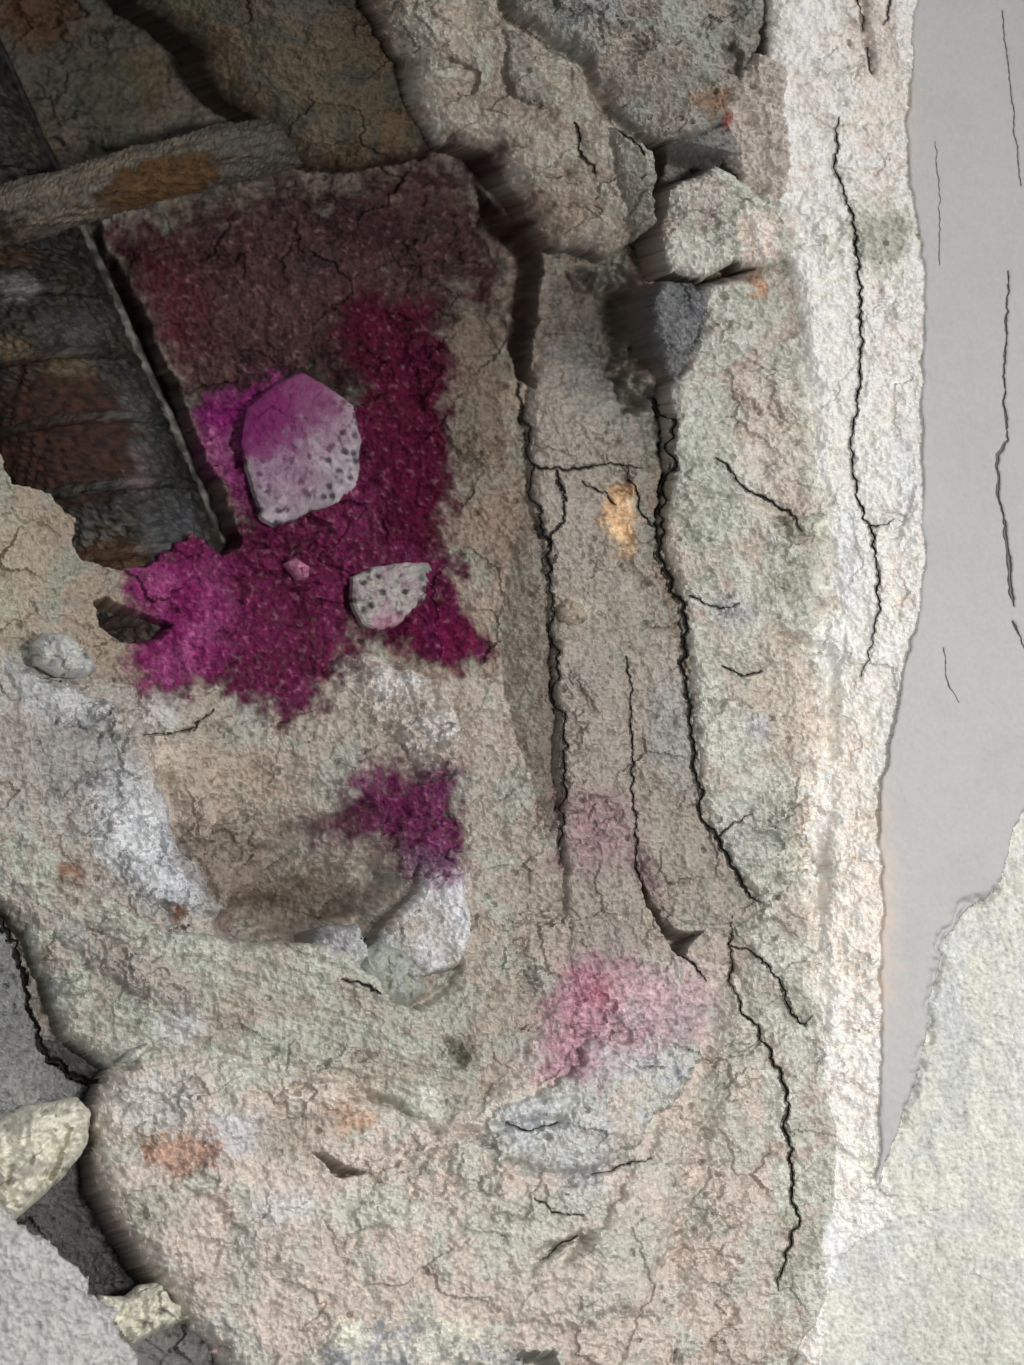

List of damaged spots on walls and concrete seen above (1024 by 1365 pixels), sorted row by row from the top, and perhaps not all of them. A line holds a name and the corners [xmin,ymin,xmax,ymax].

rust [0,372,145,507]
spalling [0,0,227,185]
rust [92,152,232,210]
spalling [0,150,517,570]
crack [574,122,596,173]
crack [833,117,894,677]
crack [996,270,1024,647]
spalling [96,597,391,943]
spalling [311,618,492,783]
crack [517,383,811,1291]
flaking render [721,0,1024,1365]
crack [0,915,218,1365]